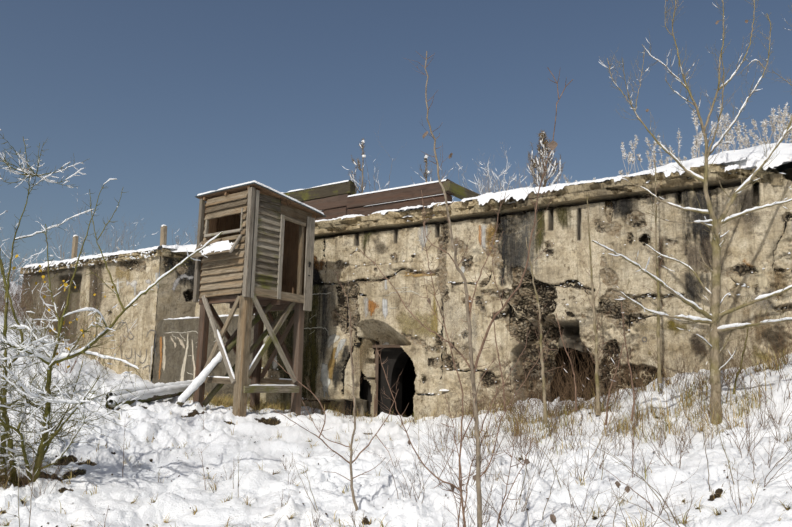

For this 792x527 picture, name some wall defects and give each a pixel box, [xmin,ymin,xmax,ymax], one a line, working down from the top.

crack [301,321,362,402]
spalling [331,259,396,333]
crack [312,241,492,396]
spalling [401,330,476,384]
spalling [405,223,474,303]
crack [546,280,589,294]
spalling [475,231,684,402]
leakage [605,197,633,220]
spalling [591,200,650,246]
leakage [683,186,719,302]